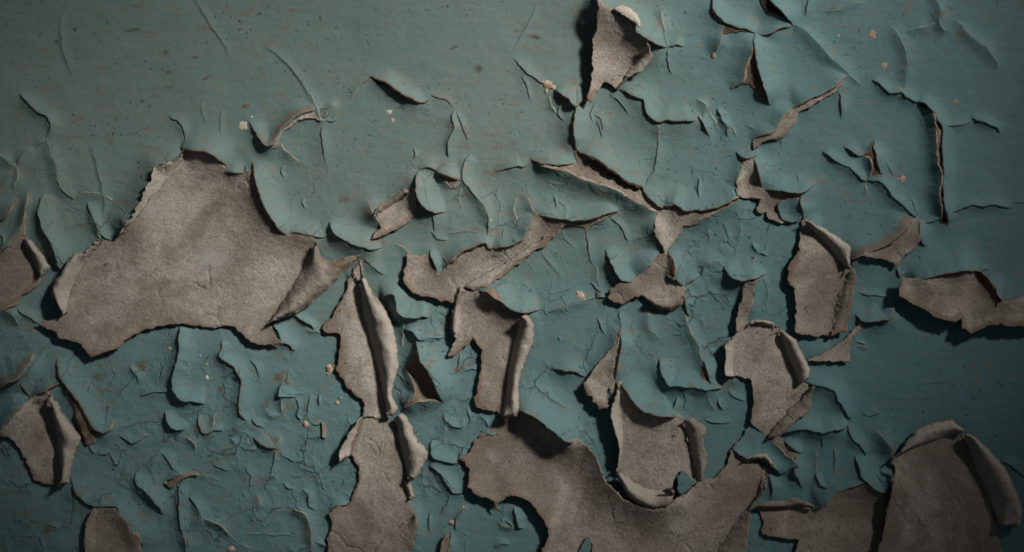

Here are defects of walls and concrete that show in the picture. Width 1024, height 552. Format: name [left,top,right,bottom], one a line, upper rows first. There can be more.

crack [652,6,679,75]
crack [792,0,1024,225]
peeling [0,189,50,311]
peeling [38,124,361,358]
peeling [322,0,1024,552]
peeling [0,357,159,552]
crack [109,311,328,552]